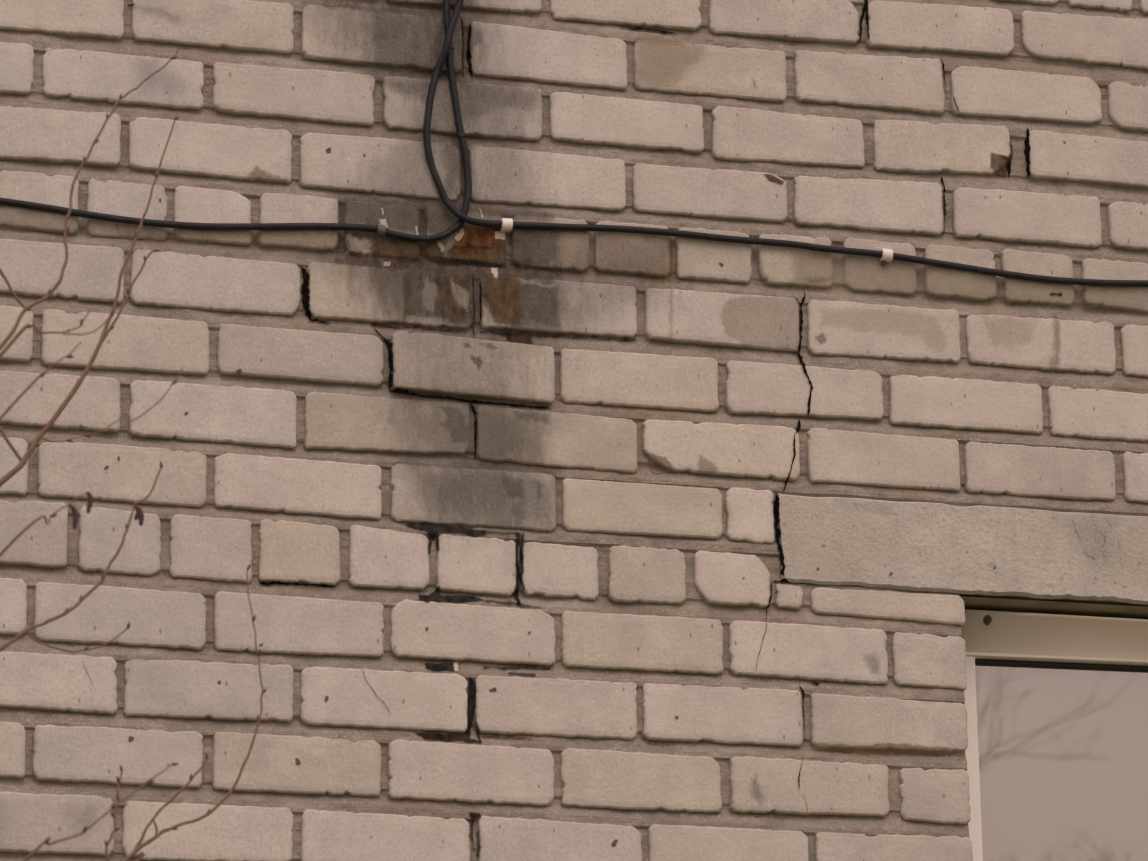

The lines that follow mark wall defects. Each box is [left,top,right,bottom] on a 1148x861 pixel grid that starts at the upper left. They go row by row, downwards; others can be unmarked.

damp [389,19,463,81]
crack [856,0,870,46]
crack [1007,128,1031,180]
crack [939,177,947,236]
rust [438,222,507,268]
crack [301,267,330,324]
crack [473,280,482,335]
crack [375,329,549,459]
crack [756,290,813,668]